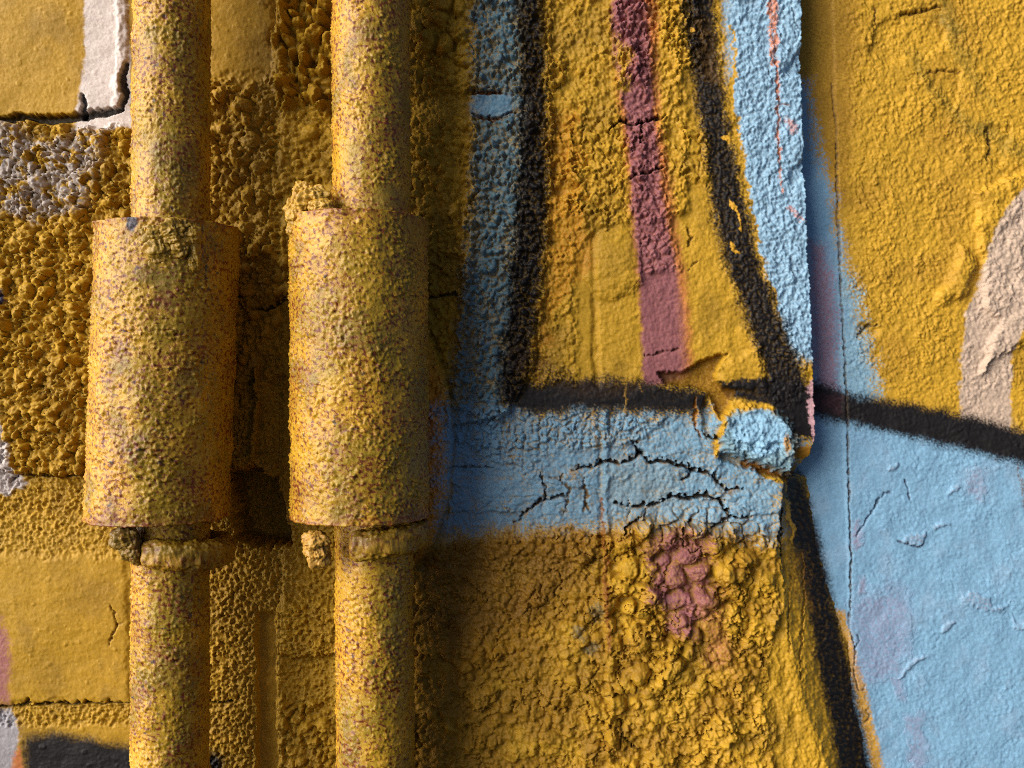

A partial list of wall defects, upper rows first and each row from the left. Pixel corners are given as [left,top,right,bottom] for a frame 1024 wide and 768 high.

crack [609,117,663,143]
crack [630,166,665,180]
crack [513,440,747,539]